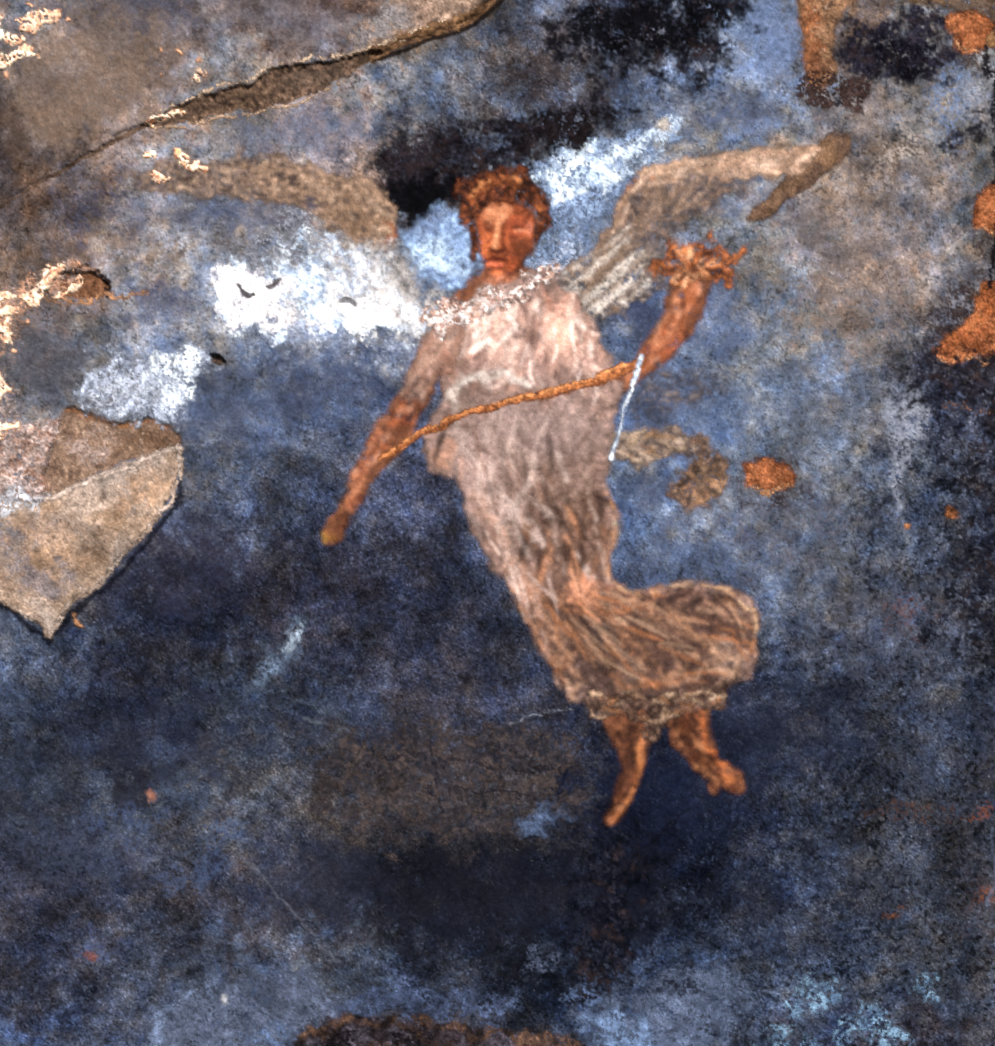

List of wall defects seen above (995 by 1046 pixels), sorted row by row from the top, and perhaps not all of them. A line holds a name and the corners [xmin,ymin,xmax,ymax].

peeling [0,3,70,78]
crack [0,0,504,208]
leakage [371,0,752,275]
peeling [0,257,149,355]
flaking render [0,371,183,645]